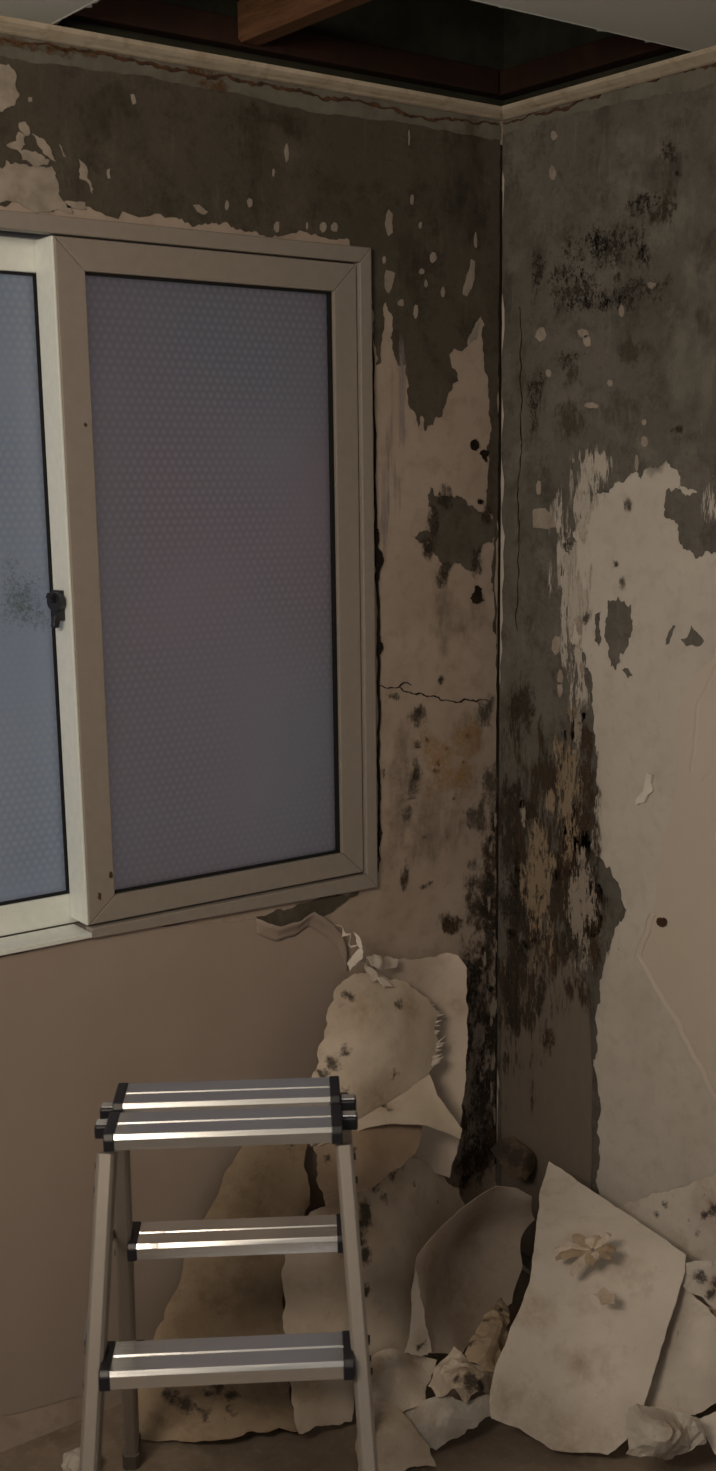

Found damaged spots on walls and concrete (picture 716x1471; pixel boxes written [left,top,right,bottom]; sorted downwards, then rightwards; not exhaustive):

crack [0,36,716,1164]
peeling [0,56,716,1195]
leakage [527,351,585,438]
leakage [531,187,716,312]
leakage [400,685,609,1259]
peeling [521,1253,532,1271]